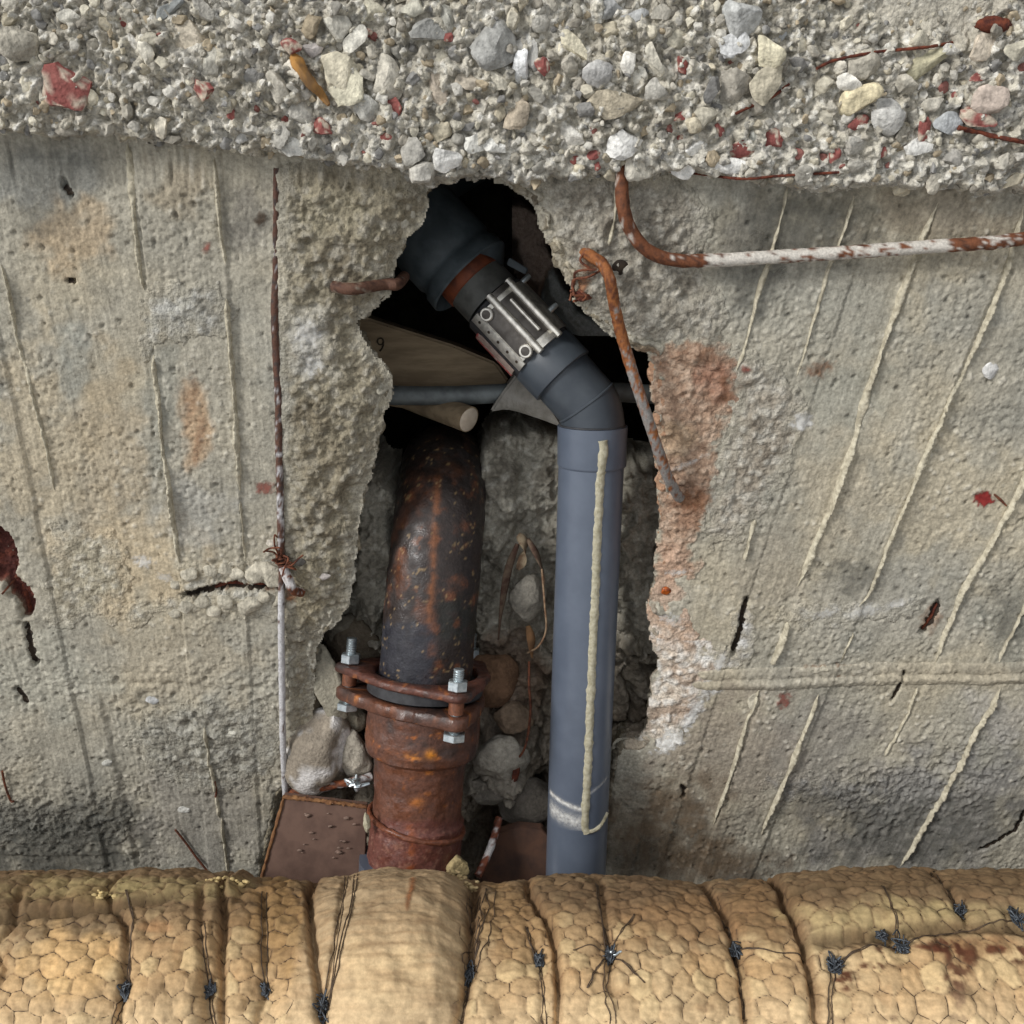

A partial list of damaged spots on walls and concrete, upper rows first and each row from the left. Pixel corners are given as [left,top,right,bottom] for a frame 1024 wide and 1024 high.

spalling [0,0,1024,797]
rust [0,526,36,622]
crack [169,562,297,619]
crack [24,622,40,662]
crack [731,596,748,651]
crack [891,670,905,698]
crack [979,811,1024,848]